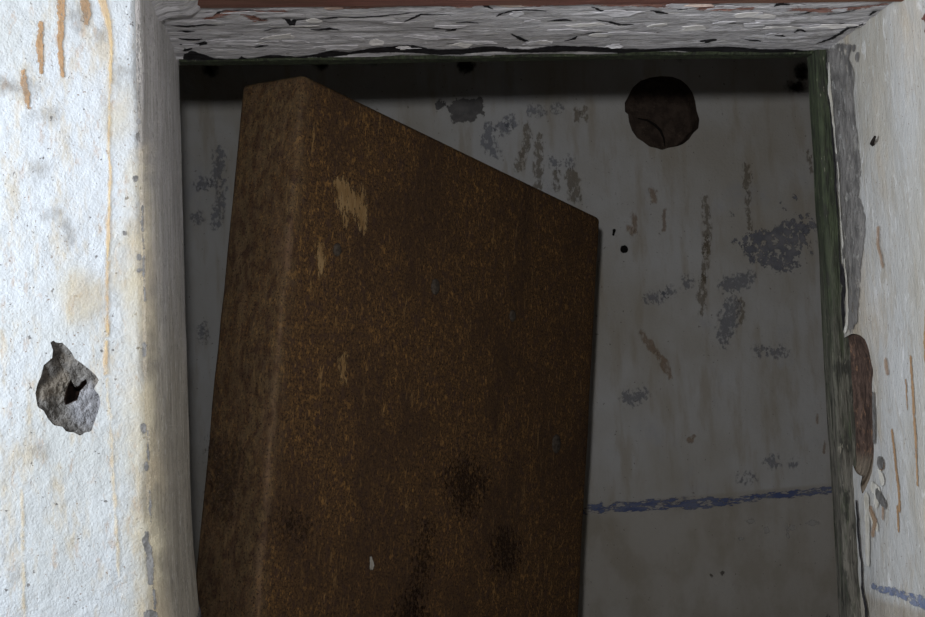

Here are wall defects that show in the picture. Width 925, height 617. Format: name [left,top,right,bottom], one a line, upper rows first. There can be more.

rust [35,21,44,74]
rust [56,0,65,78]
rust [80,0,91,25]
flaking render [182,18,384,51]
flaking render [396,25,497,50]
flaking render [495,3,888,49]
rust [20,69,31,109]
peeling [732,202,817,272]
spalling [35,341,100,435]
rust [905,355,918,486]
rust [880,429,901,532]
crack [855,500,868,617]